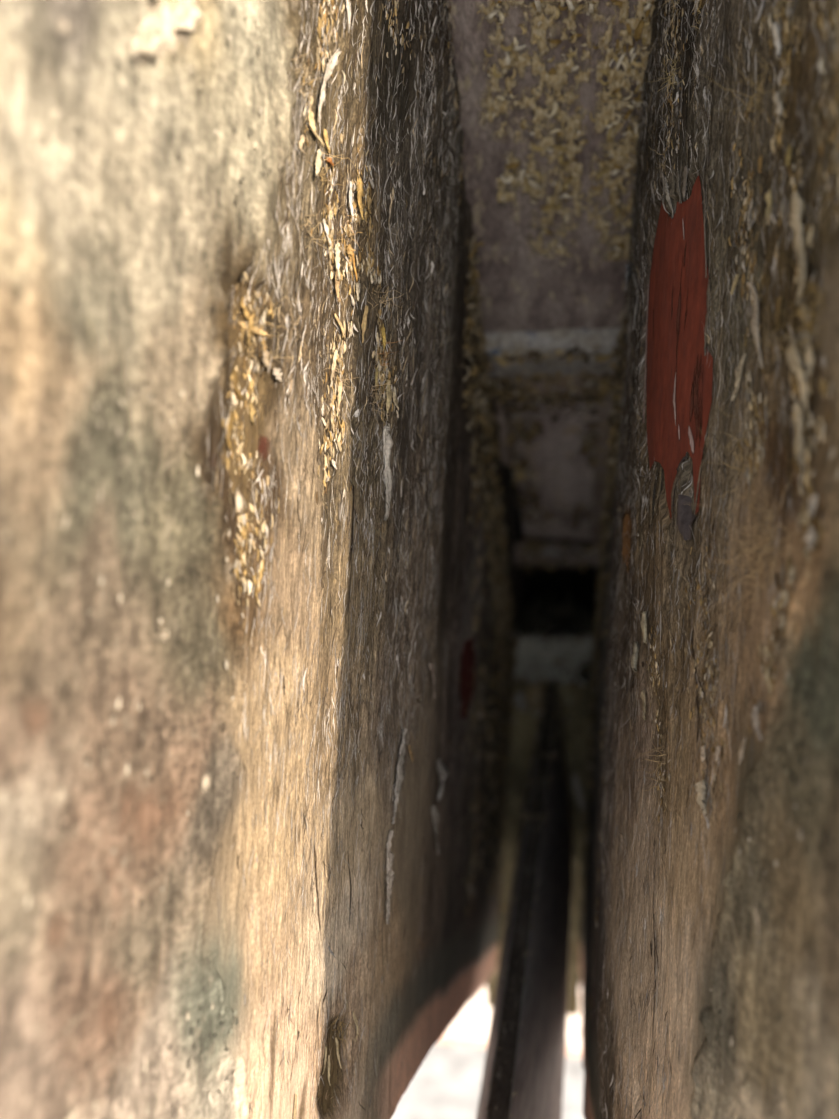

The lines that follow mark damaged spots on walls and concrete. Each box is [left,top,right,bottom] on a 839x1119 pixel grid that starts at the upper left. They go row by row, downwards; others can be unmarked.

peeling [382,0,422,73]
peeling [220,272,283,618]
peeling [297,0,399,505]
peeling [477,0,713,554]
peeling [728,0,839,765]
peeling [631,612,673,747]
crack [691,628,708,773]
peeling [683,542,726,814]